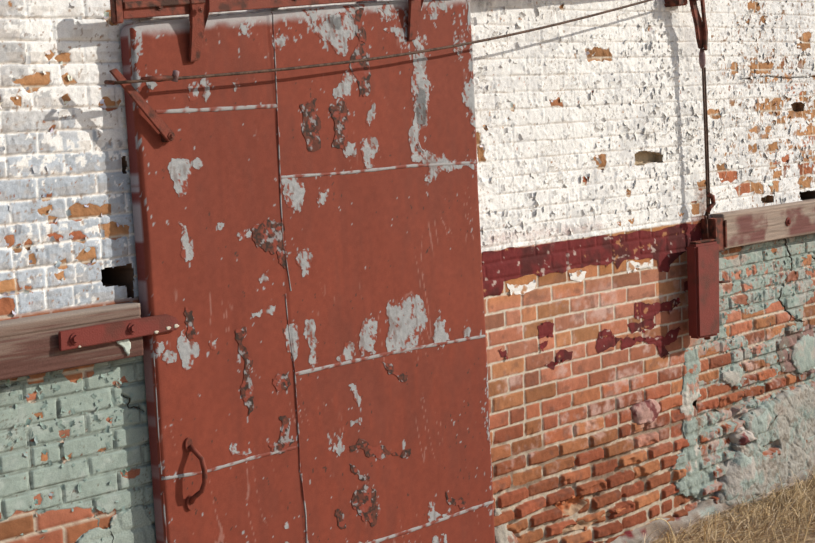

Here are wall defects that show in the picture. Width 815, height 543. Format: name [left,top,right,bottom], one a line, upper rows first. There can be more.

peeling [0,50,77,116]
peeling [168,157,203,197]
corrosion [300,98,321,152]
corrosion [329,100,349,151]
peeling [377,0,565,192]
peeling [478,0,815,298]
spalling [38,193,134,298]
peeling [0,278,33,321]
peeling [153,330,219,370]
peeling [284,319,319,365]
peeling [336,294,450,362]
spalling [670,235,815,506]